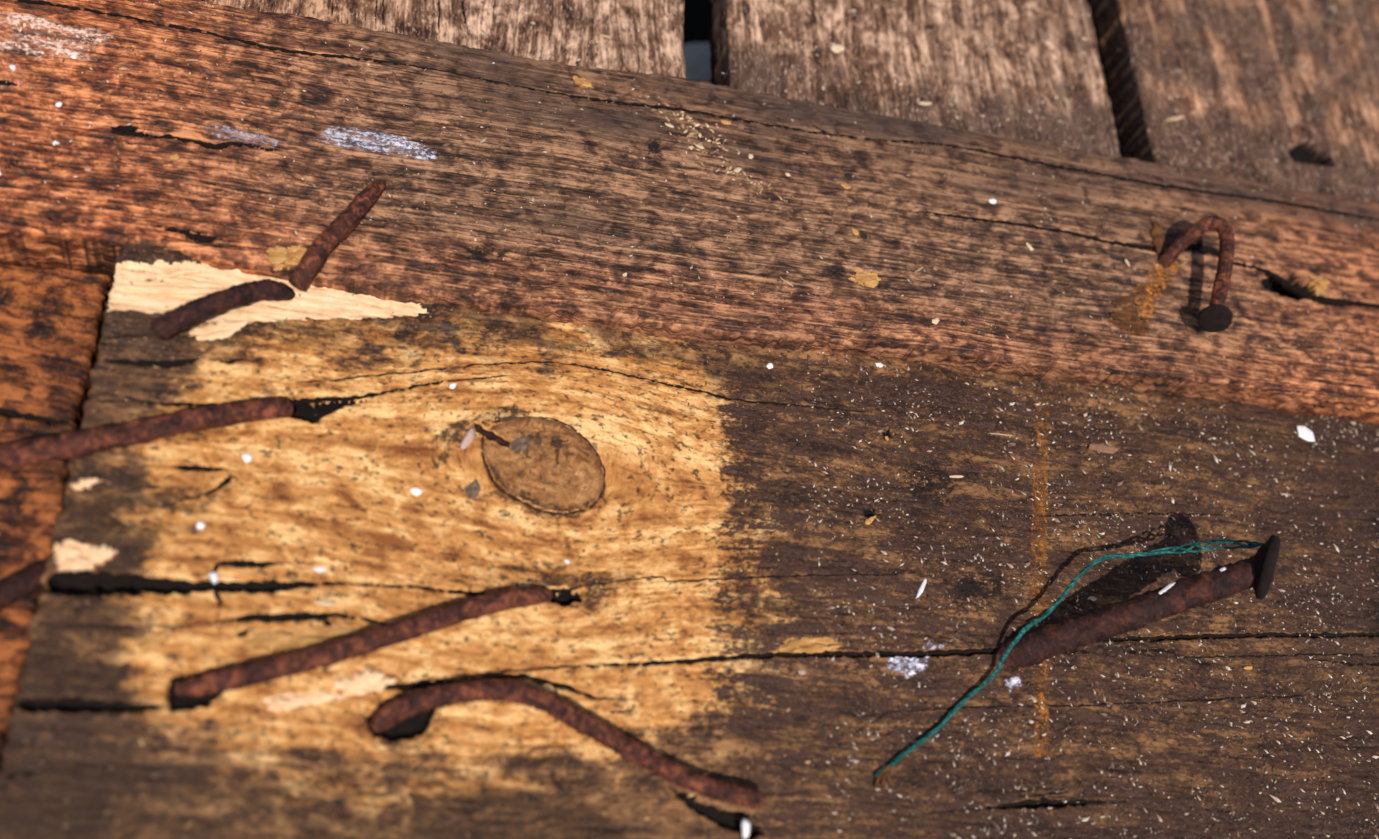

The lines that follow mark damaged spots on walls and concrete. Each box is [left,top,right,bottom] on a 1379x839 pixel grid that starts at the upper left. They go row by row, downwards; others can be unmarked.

corrosion [1124,261,1180,333]
crack [38,560,486,638]
crack [551,573,896,594]
crack [385,648,998,714]
crack [888,695,1303,712]
crack [1064,632,1379,666]